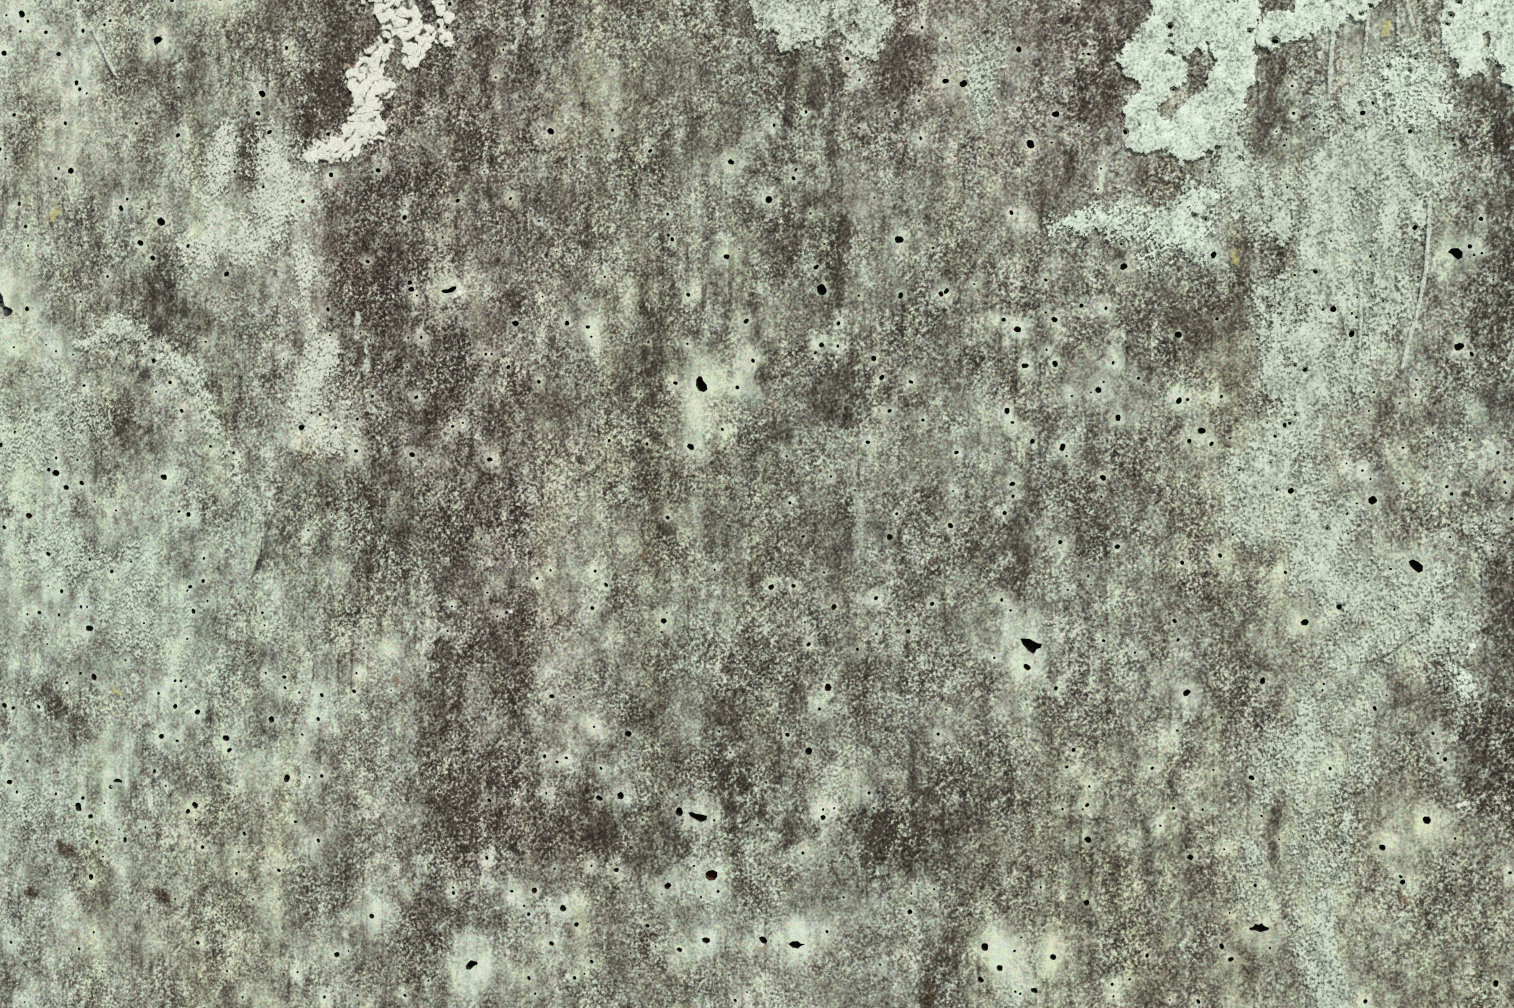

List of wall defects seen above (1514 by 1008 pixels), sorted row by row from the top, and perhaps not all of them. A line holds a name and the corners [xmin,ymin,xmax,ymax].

water stain [747,0,906,197]
water stain [943,0,1029,132]
water stain [835,214,852,308]
water stain [0,0,699,915]
water stain [813,363,863,429]
water stain [1003,511,1033,591]
water stain [1043,0,1514,1008]